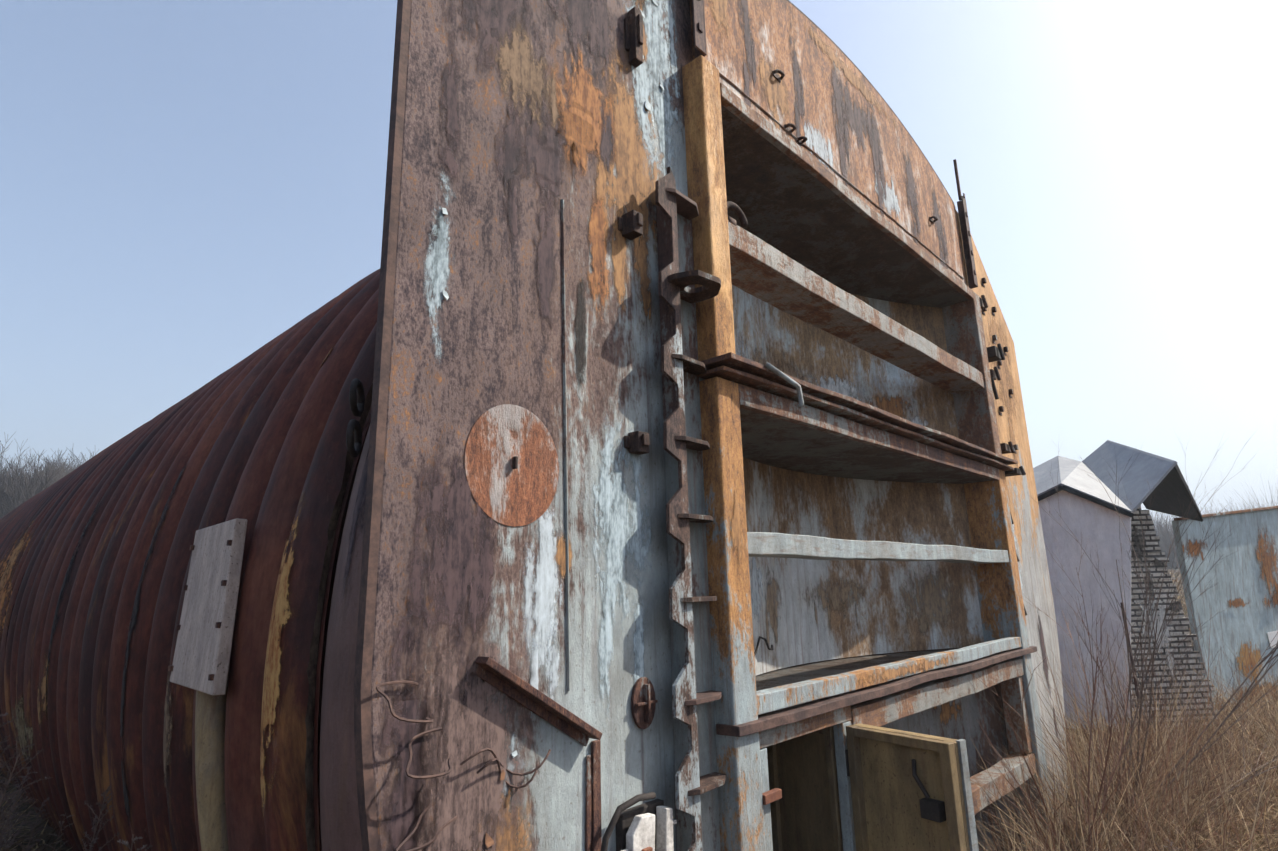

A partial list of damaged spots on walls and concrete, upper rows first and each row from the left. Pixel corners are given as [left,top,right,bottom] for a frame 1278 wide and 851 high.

peeling [426,176,450,340]
corrosion [440,0,662,326]
peeling [628,0,679,176]
corrosion [832,64,886,217]
damp [875,172,900,215]
corrosion [904,153,948,269]
corrosion [988,318,1019,468]
peeling [260,517,298,804]
peeling [593,426,651,698]
corrosion [766,570,782,644]
corrosion [1037,611,1058,738]
corrosion [1256,528,1278,607]